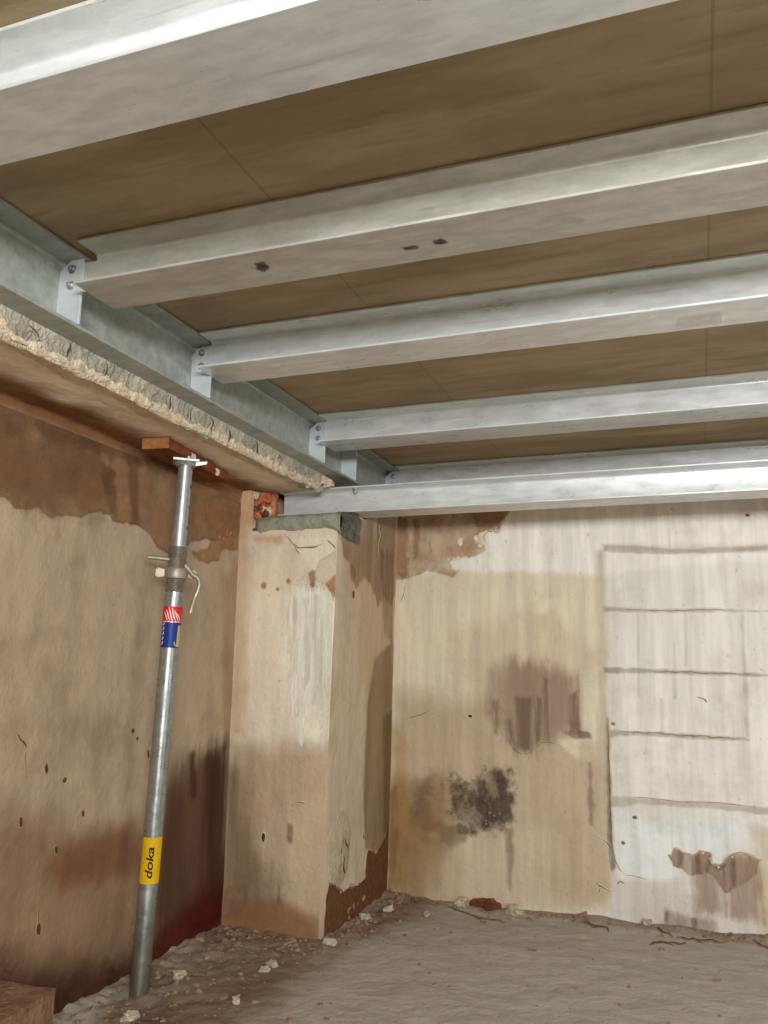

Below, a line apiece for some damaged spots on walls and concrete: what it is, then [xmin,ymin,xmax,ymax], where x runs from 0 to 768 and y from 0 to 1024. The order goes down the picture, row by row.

spalling [0,318,336,520]
peeling [396,511,507,579]
damp [511,664,589,748]
damp [160,754,223,946]
spalling [322,825,394,947]